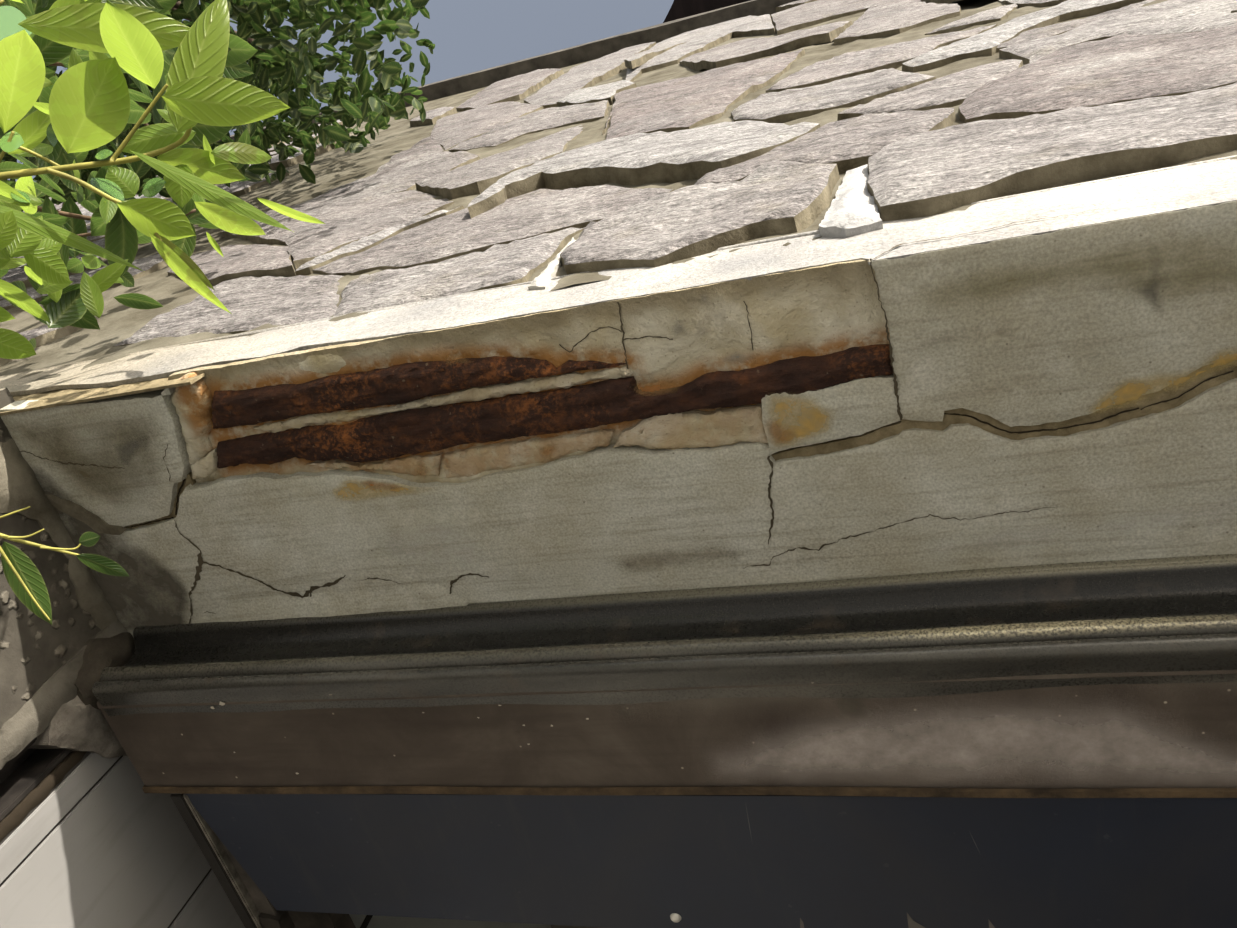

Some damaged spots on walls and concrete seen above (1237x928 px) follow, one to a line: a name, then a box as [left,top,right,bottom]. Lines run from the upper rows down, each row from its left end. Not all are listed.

crack [20,451,124,469]
crack [45,444,400,624]
crack [449,573,489,594]
spalling [168,259,890,483]
rust [211,344,893,468]
crack [745,209,1237,568]